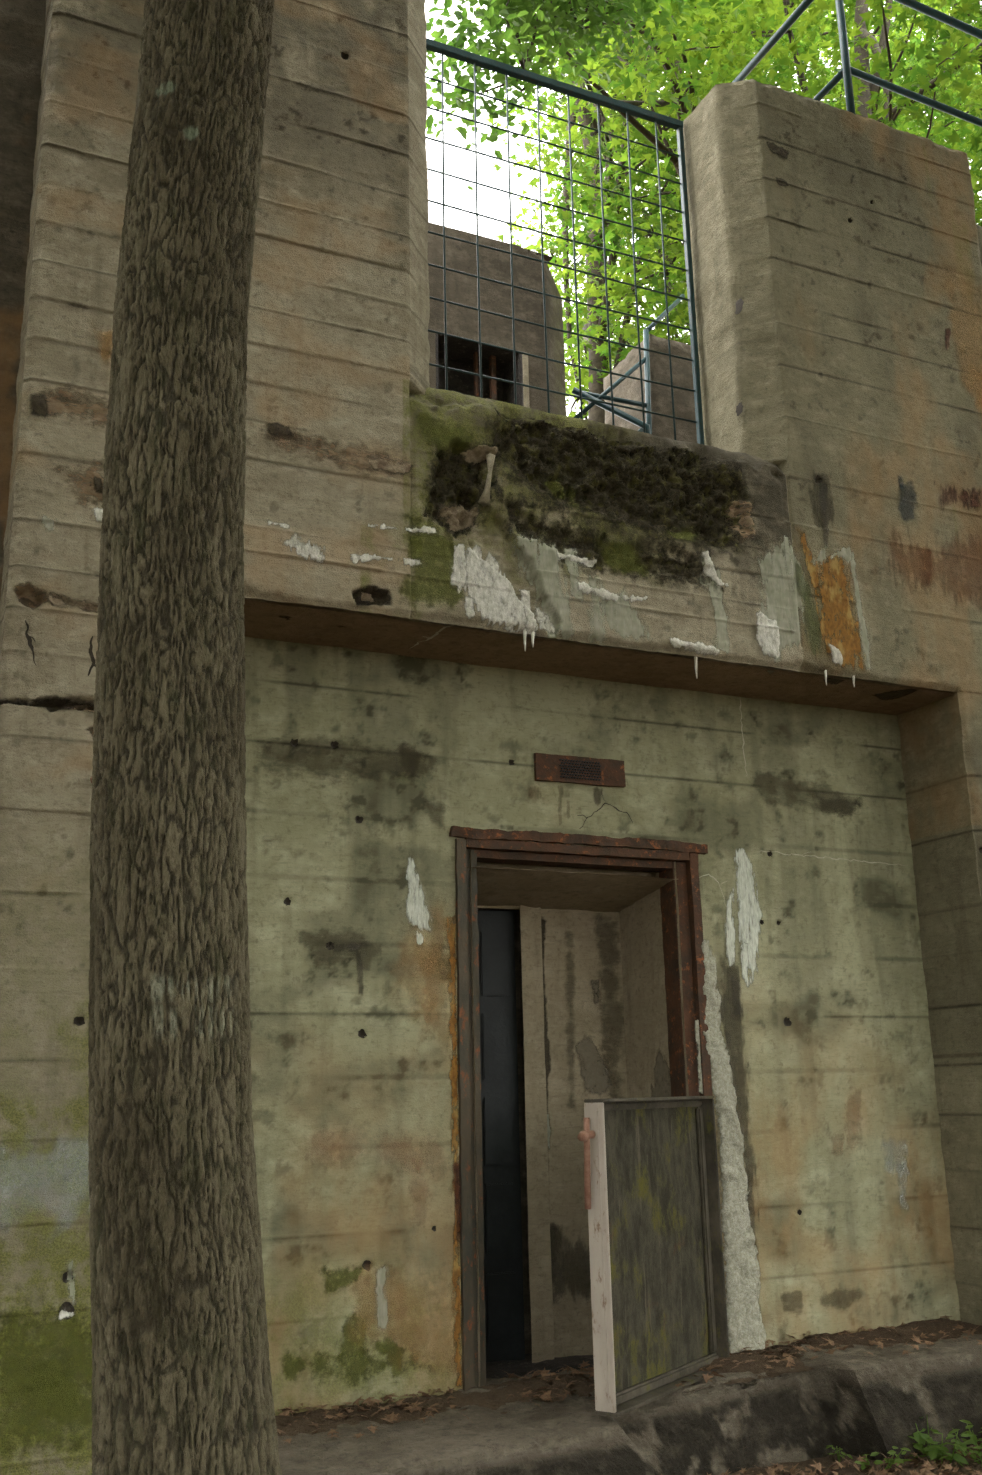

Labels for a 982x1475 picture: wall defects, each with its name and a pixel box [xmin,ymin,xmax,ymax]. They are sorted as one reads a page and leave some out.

spalling [30,388,108,426]
spalling [261,408,756,592]
corrosion [940,486,982,510]
spalling [15,582,98,612]
corrosion [797,529,871,671]
spalling [0,697,94,736]
corrosion [447,915,462,1387]